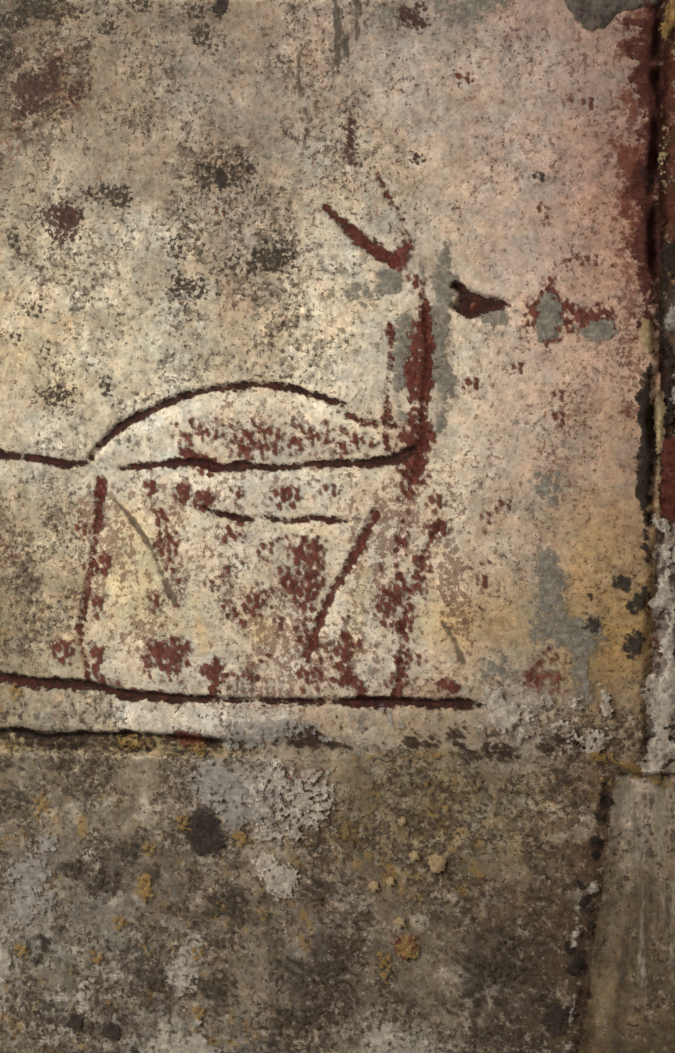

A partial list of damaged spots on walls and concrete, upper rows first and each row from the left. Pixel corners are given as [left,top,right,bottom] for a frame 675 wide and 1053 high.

crack [0,726,234,758]
crack [271,722,352,751]